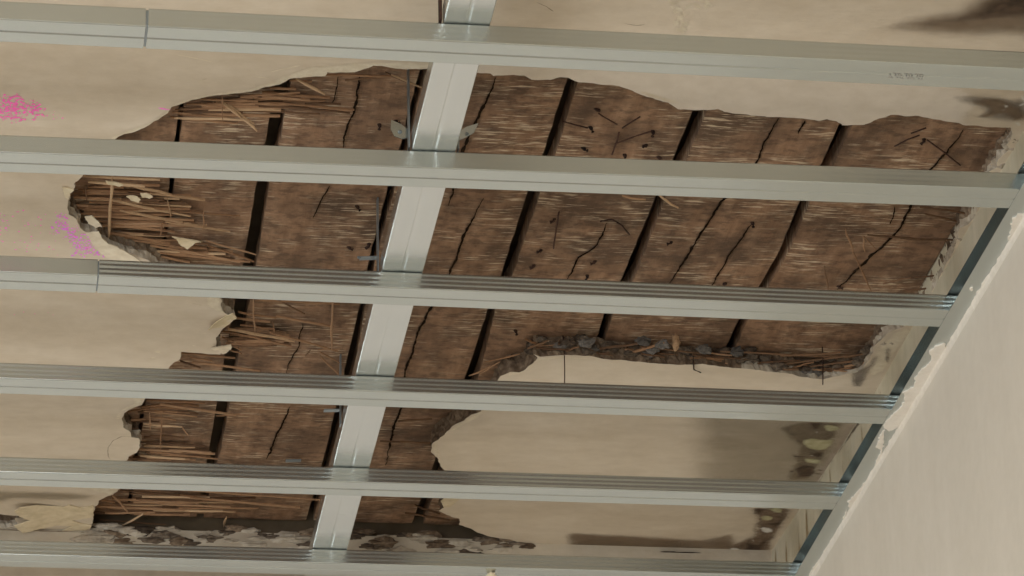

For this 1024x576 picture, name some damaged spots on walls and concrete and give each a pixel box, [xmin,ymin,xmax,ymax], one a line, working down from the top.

water stain [868,0,1024,42]
peeling [112,62,429,139]
water stain [956,93,1024,126]
spalling [62,180,202,263]
crack [449,198,484,274]
crack [670,198,726,282]
crack [837,205,912,290]
spalling [206,297,237,354]
crack [404,306,434,377]
spalling [490,324,905,381]
spalling [430,409,481,461]
water stain [676,417,863,482]